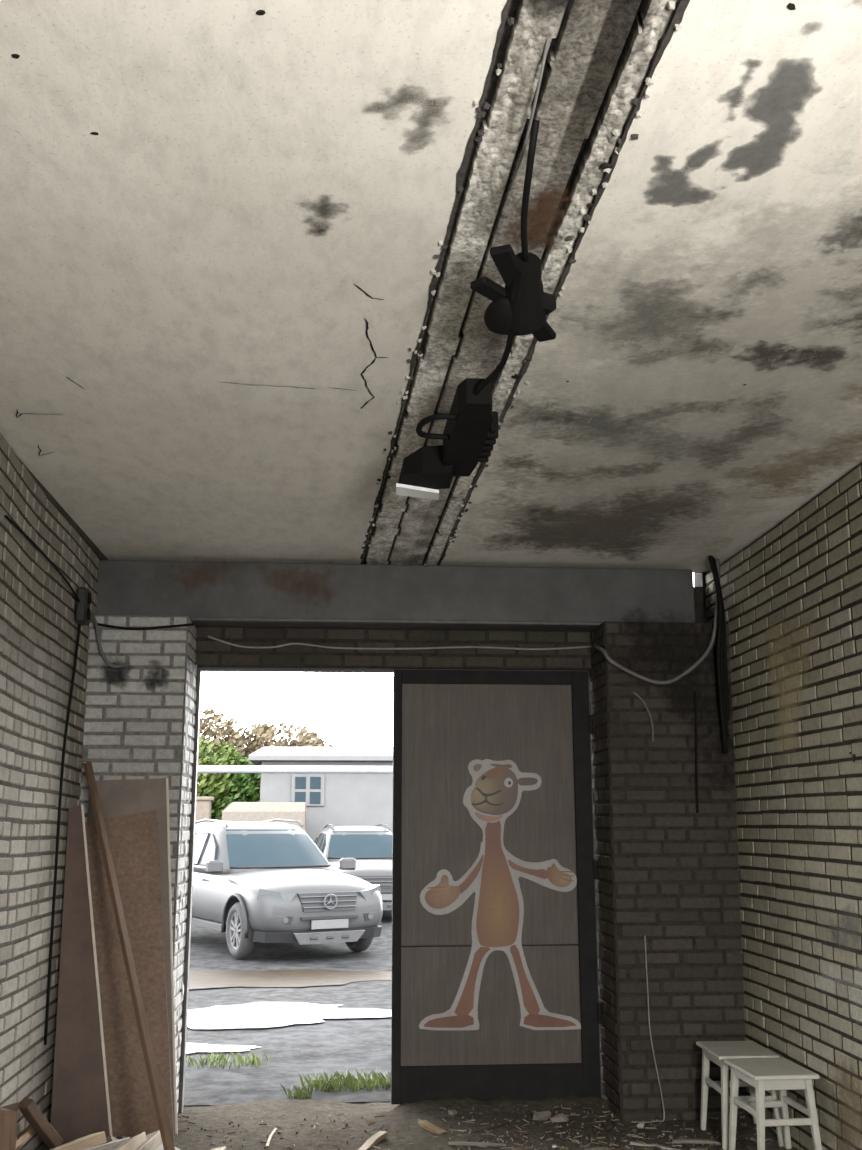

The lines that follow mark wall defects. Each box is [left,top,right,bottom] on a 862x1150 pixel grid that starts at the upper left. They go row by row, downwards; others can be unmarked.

damp [367,88,446,148]
damp [306,197,336,234]
crack [223,284,388,409]
damp [493,486,705,558]